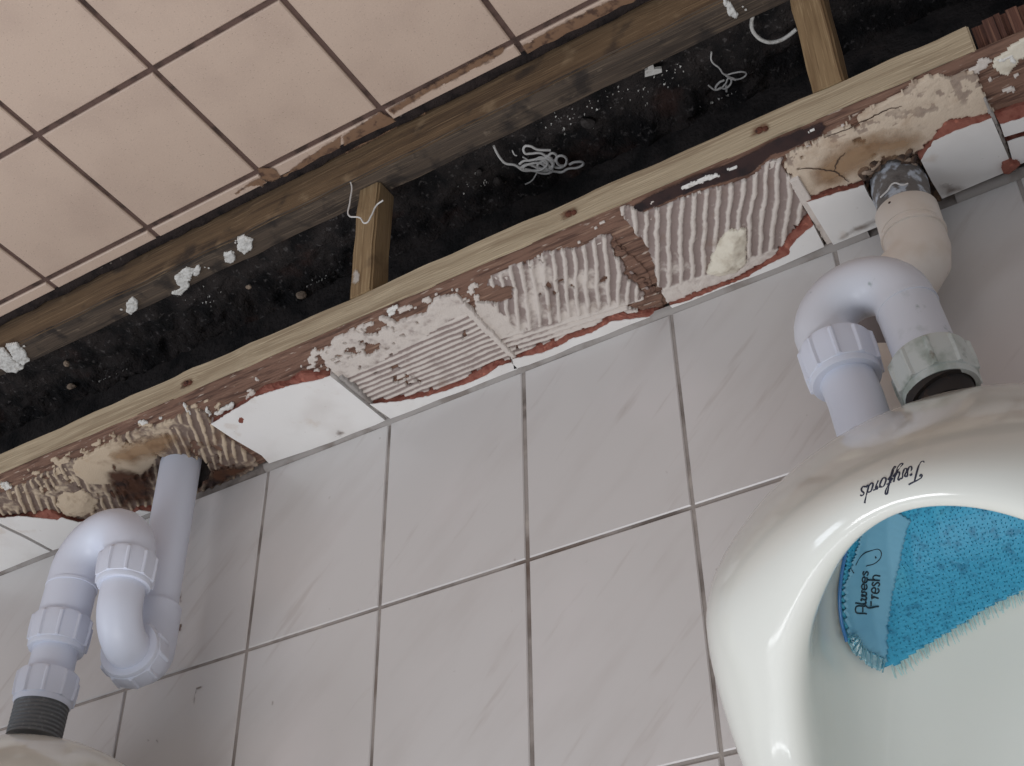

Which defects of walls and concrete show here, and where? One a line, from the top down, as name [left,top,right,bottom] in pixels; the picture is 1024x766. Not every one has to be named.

spalling [843,0,1024,199]
spalling [388,70,813,282]
crack [797,106,902,182]
damp [817,138,911,182]
spalling [183,160,881,463]
spalling [0,275,352,454]
peeling [0,417,162,501]
damp [97,435,171,507]
spalling [198,460,211,488]
spalling [0,508,84,572]